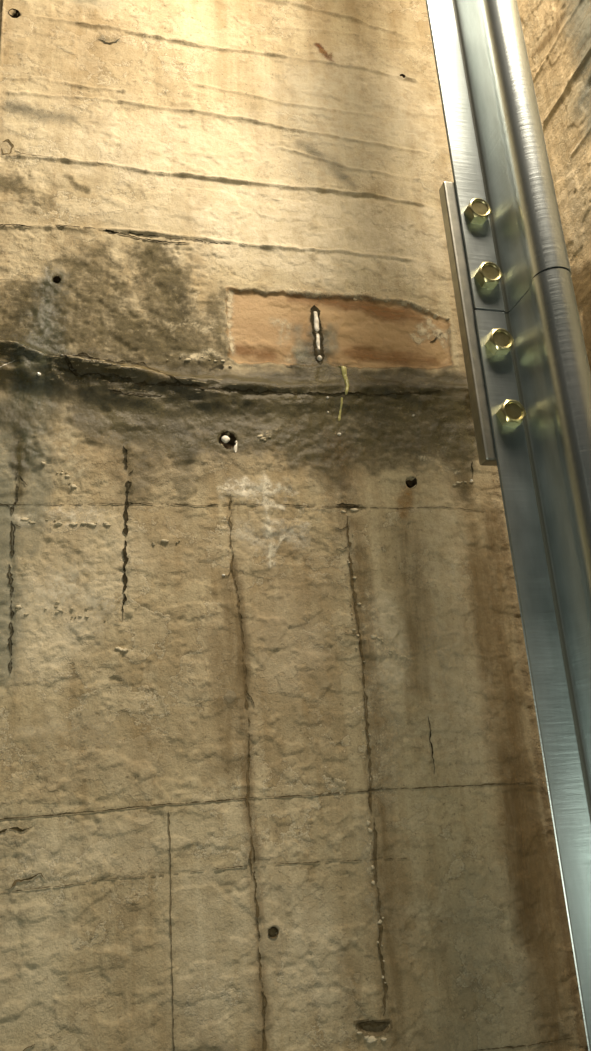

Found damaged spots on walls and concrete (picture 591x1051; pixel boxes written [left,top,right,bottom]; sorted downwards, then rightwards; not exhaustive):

damp [0,444,27,476]
damp [0,243,227,375]
crack [13,341,440,396]
damp [46,328,477,492]
damp [572,262,591,372]
crack [0,445,525,1051]
spalling [353,1018,393,1044]
crack [474,1038,570,1051]